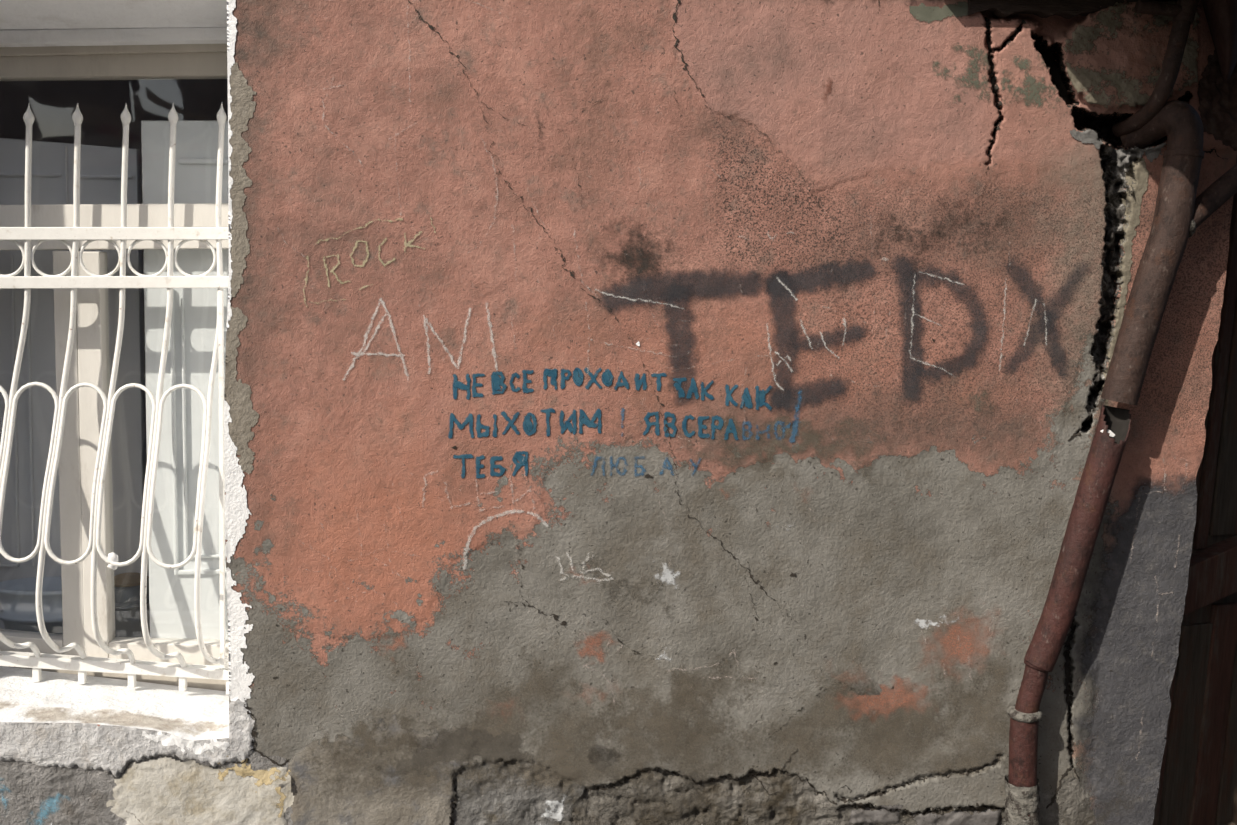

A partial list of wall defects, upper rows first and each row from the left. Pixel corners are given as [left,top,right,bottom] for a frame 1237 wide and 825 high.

crack [982,17,1079,194]
peeling [0,129,1167,825]
crack [408,0,790,617]
crack [1068,145,1166,441]
peeling [1037,477,1197,825]